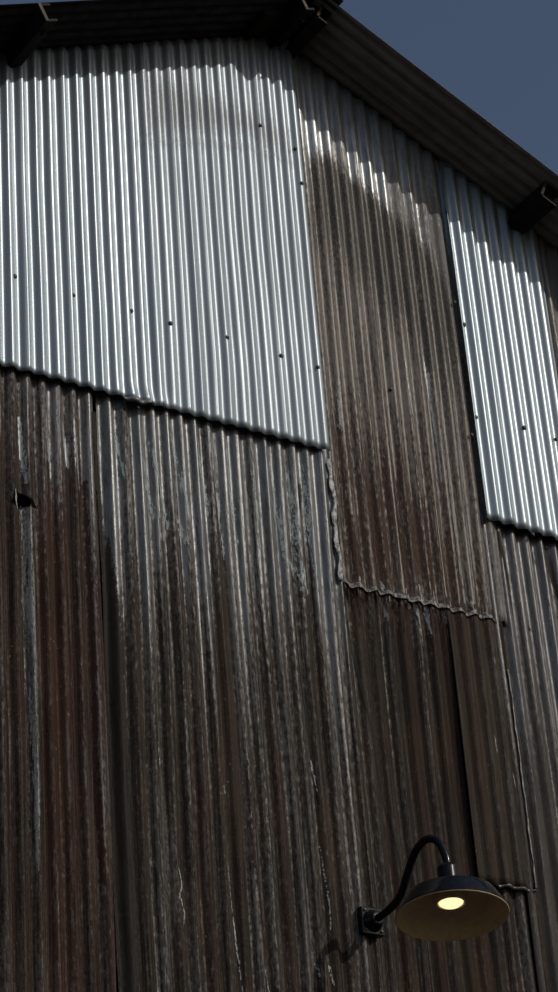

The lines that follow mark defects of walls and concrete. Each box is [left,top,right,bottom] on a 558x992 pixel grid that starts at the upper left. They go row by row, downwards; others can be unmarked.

rust [303,146,516,679]